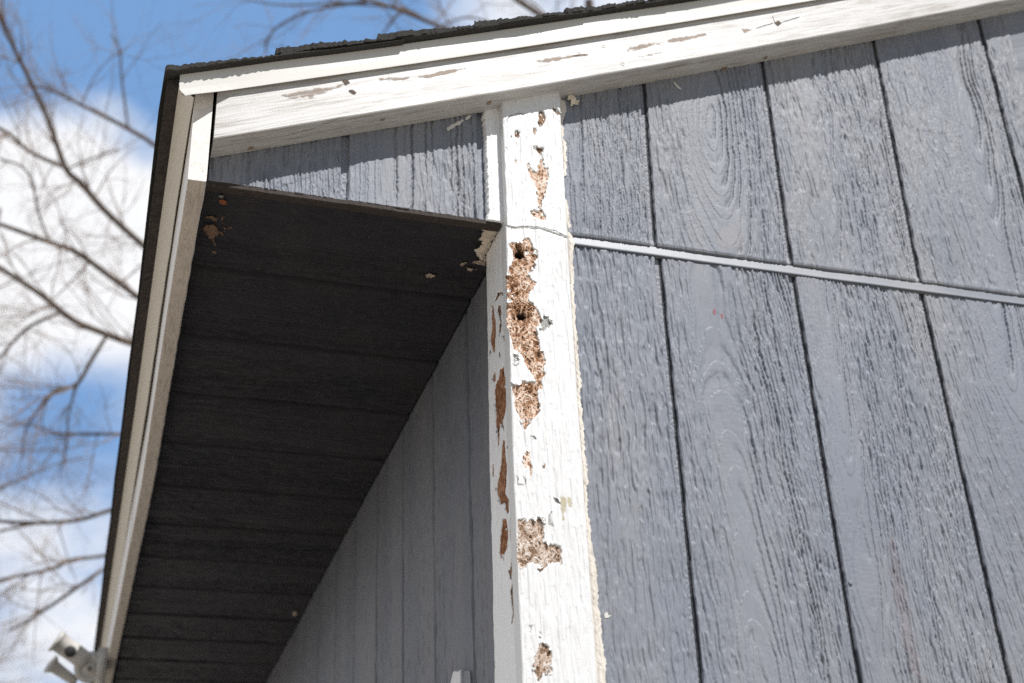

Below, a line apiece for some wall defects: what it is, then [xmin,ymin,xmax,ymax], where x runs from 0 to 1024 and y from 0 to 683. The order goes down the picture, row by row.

peeling [514,95,580,221]
peeling [489,238,562,623]
peeling [529,625,553,682]